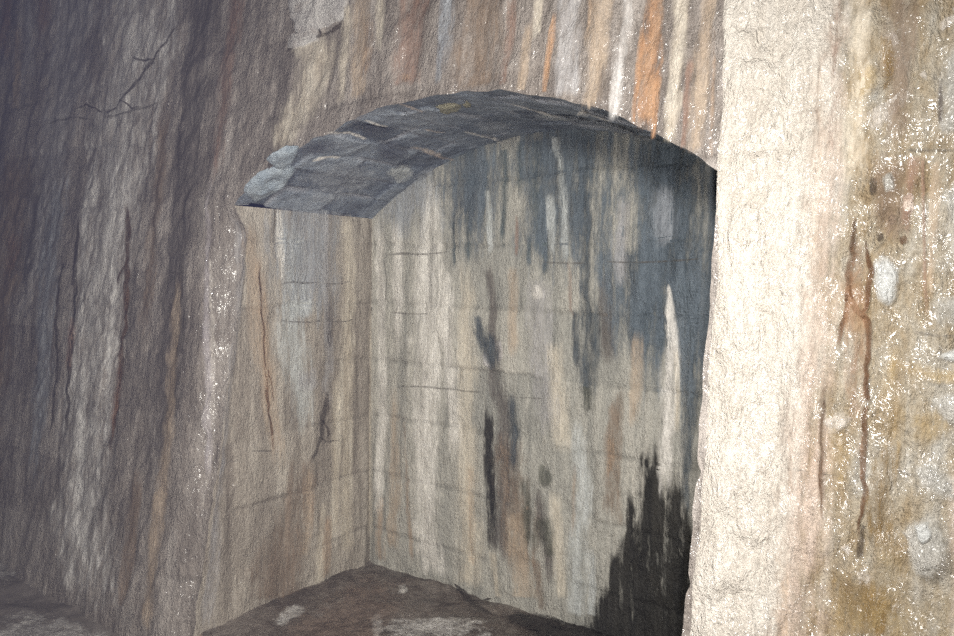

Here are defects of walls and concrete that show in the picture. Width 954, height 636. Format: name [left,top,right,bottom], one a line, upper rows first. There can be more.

crack [79,28,175,112]
leakage [476,273,551,568]
leakage [506,0,845,636]